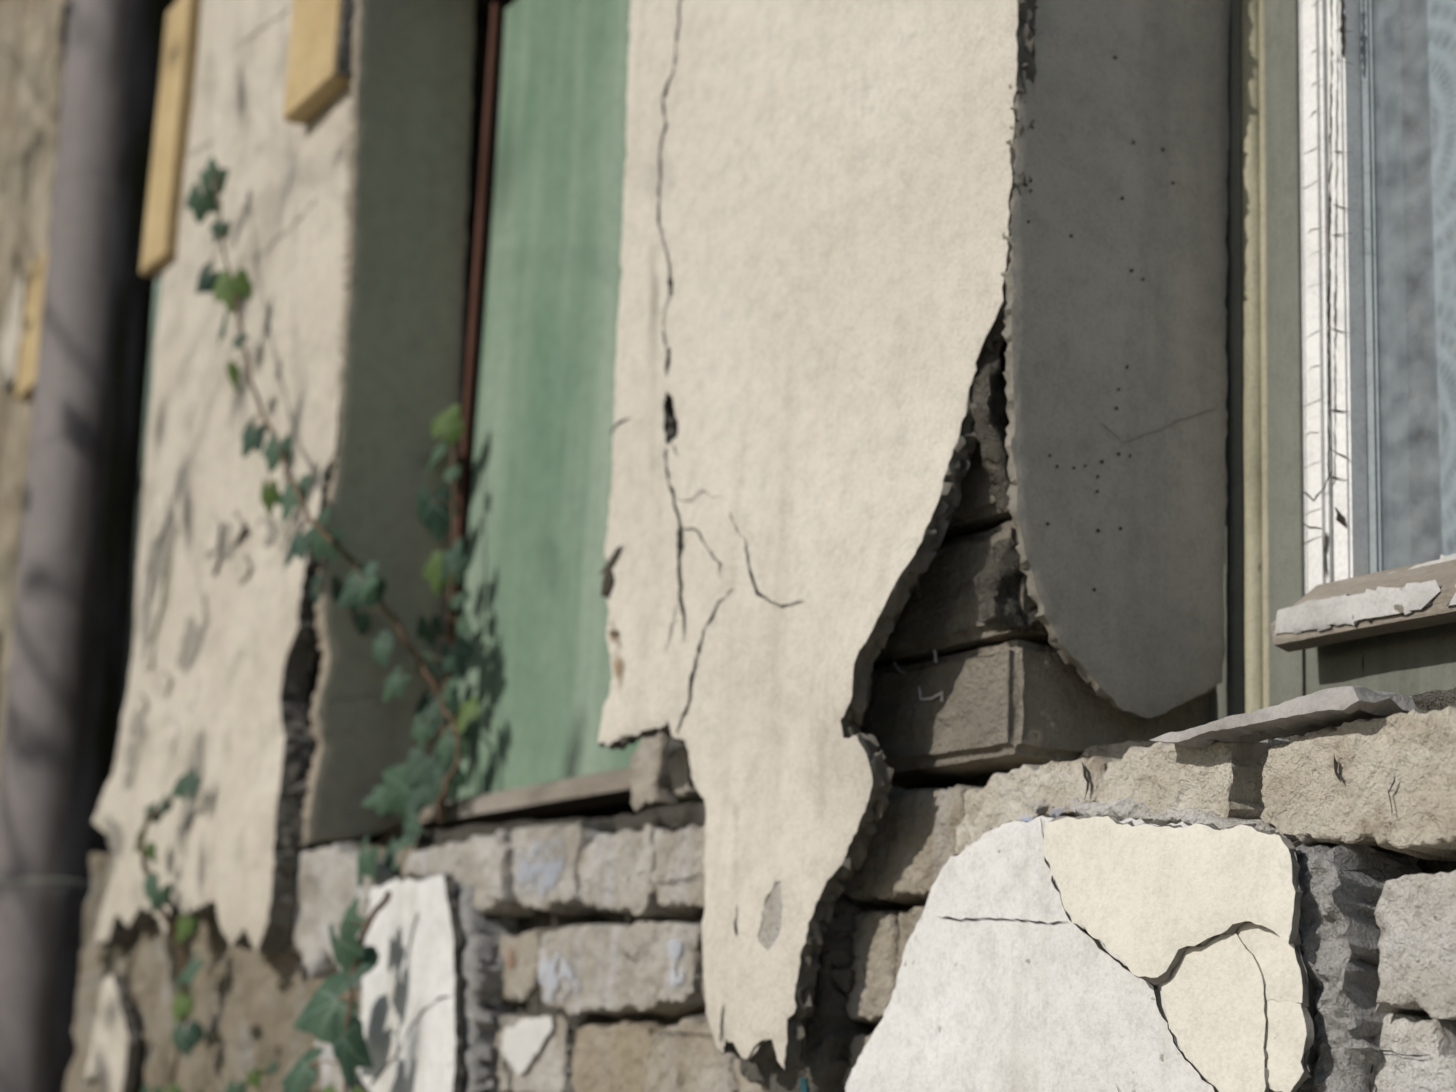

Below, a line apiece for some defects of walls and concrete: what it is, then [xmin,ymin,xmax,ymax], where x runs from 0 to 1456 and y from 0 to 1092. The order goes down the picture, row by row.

crack [657,0,680,346]
flaking render [64,0,769,1092]
crack [664,442,803,734]
flaking render [598,0,1456,1092]
crack [937,916,1061,924]